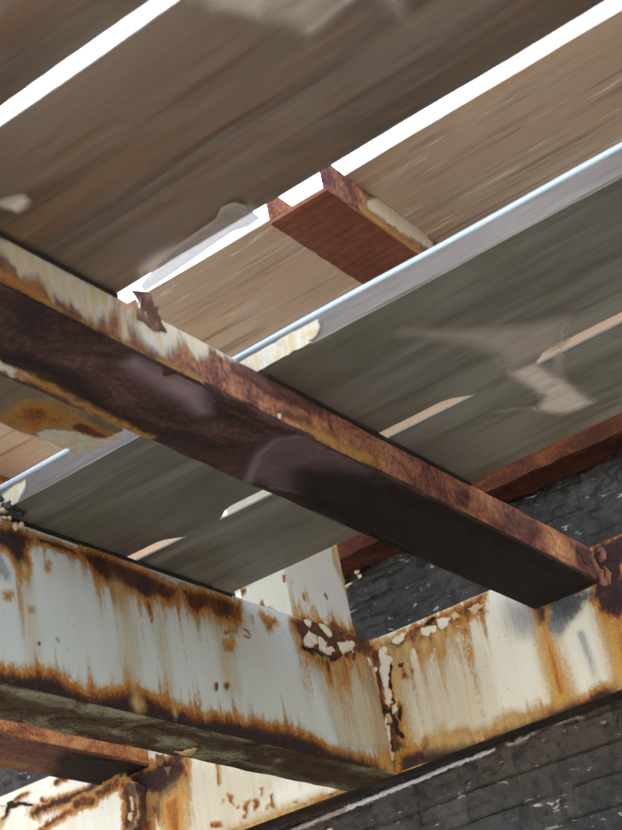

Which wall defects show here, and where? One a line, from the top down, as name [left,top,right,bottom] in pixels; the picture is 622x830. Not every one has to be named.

rust [0,269,63,313]
rust [0,371,156,439]
rust [156,358,204,384]
rust [232,363,312,423]
rust [456,413,622,508]
rust [0,520,622,830]
peeling [289,592,487,715]